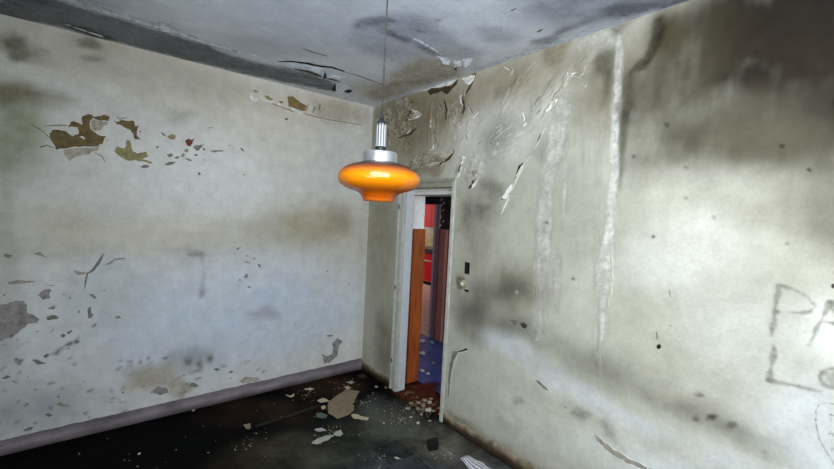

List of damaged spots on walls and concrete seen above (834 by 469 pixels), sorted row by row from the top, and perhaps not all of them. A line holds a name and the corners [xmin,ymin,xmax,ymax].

leakage [606,4,666,16]
leakage [635,17,664,68]
peeling [408,11,657,132]
peeling [250,90,308,121]
spalling [32,113,154,168]
spalling [165,139,244,166]
peeling [440,149,478,188]
spalling [0,285,80,349]
spalling [321,335,342,364]
peeling [448,348,467,398]
spalling [594,435,648,469]